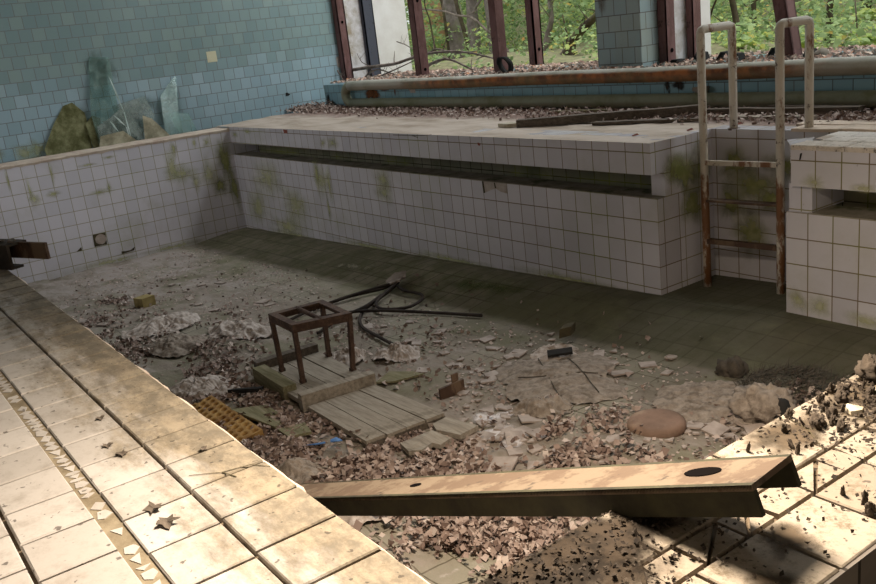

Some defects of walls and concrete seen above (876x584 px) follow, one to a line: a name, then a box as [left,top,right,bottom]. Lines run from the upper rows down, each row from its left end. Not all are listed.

peeling [93,233,107,247]